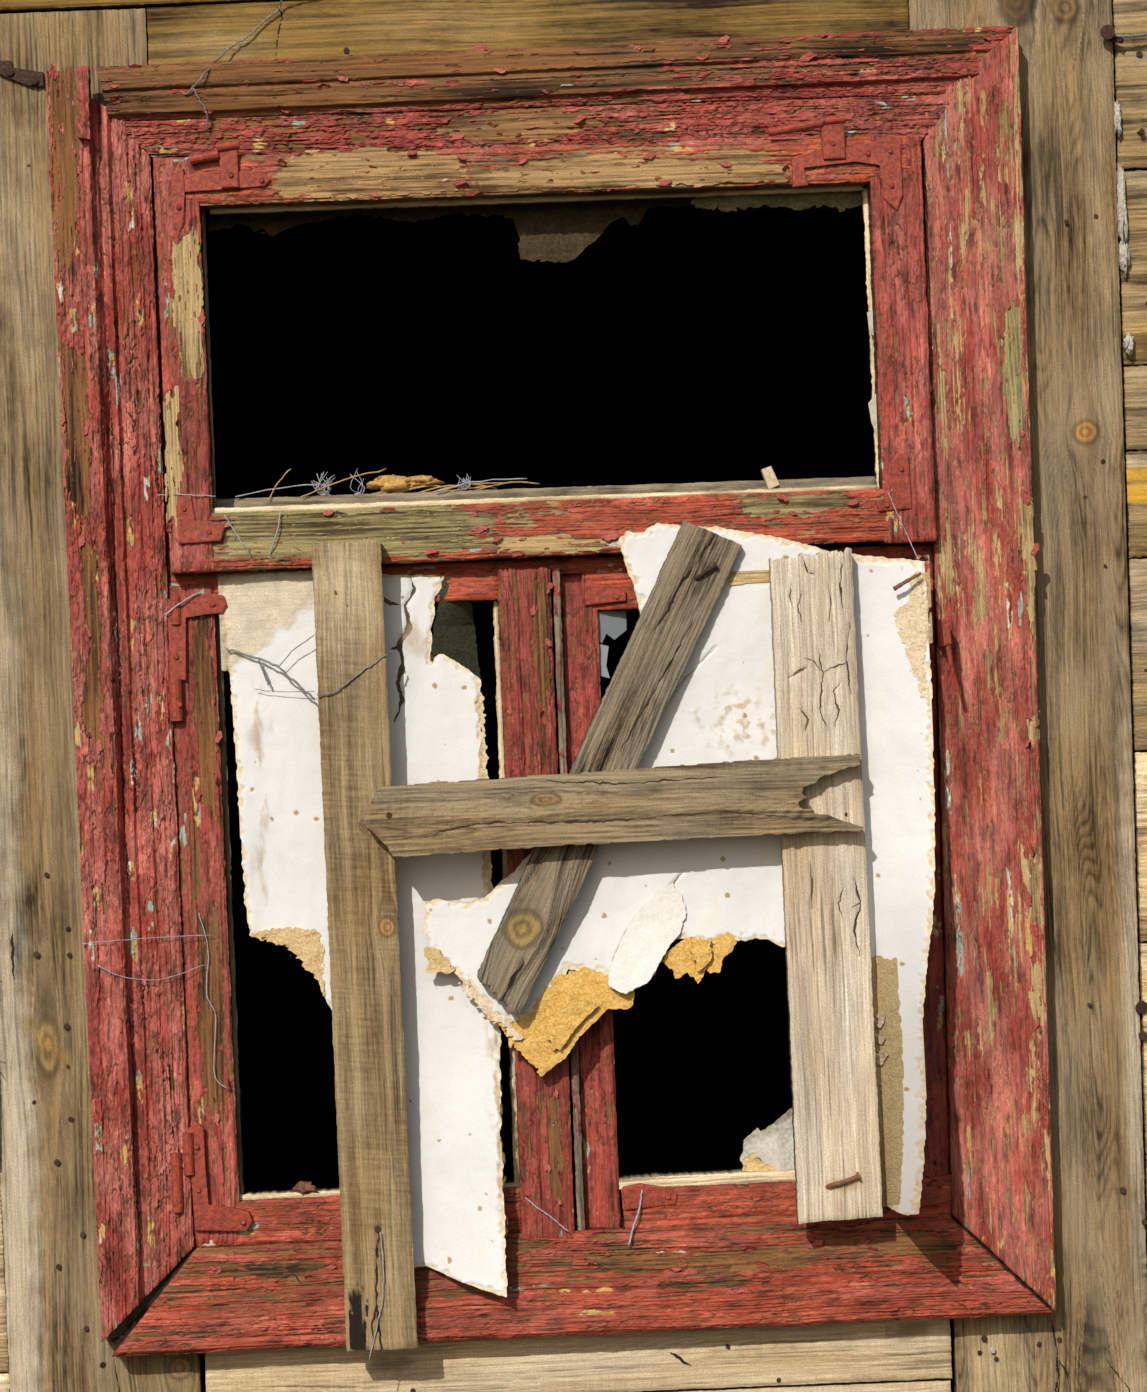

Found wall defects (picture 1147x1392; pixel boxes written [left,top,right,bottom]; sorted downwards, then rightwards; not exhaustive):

peeling [781,30,994,62]
peeling [107,35,792,200]
peeling [163,221,205,533]
peeling [59,339,104,754]
peeling [222,507,619,558]
peeling [733,492,858,517]
peeling [1020,490,1039,628]
crack [384,580,416,722]
crack [538,533,717,785]
peeling [894,571,930,705]
crack [405,810,801,839]
peeling [196,907,230,1126]